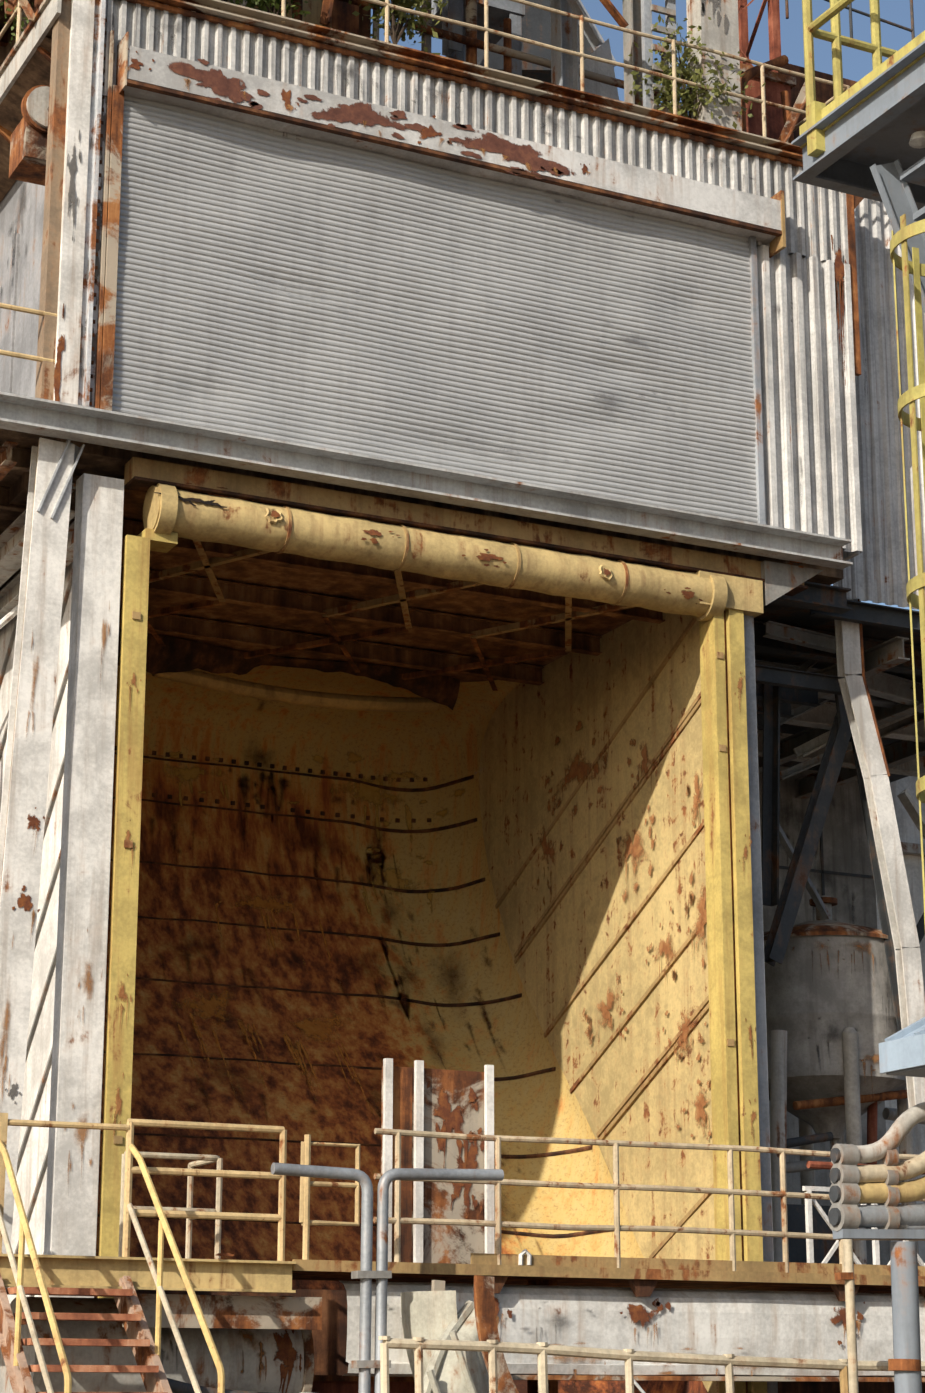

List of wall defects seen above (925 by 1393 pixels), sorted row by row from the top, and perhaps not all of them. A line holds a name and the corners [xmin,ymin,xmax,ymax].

rust [186,483,280,518]
rust [361,529,400,544]
rust [462,549,507,568]
rust [627,728,658,789]
rust [532,721,608,905]
rust [616,805,655,902]
rust [645,871,707,980]
rust [582,975,627,1045]
rust [663,1010,706,1062]
rust [372,1005,503,1264]
rust [676,1079,711,1139]